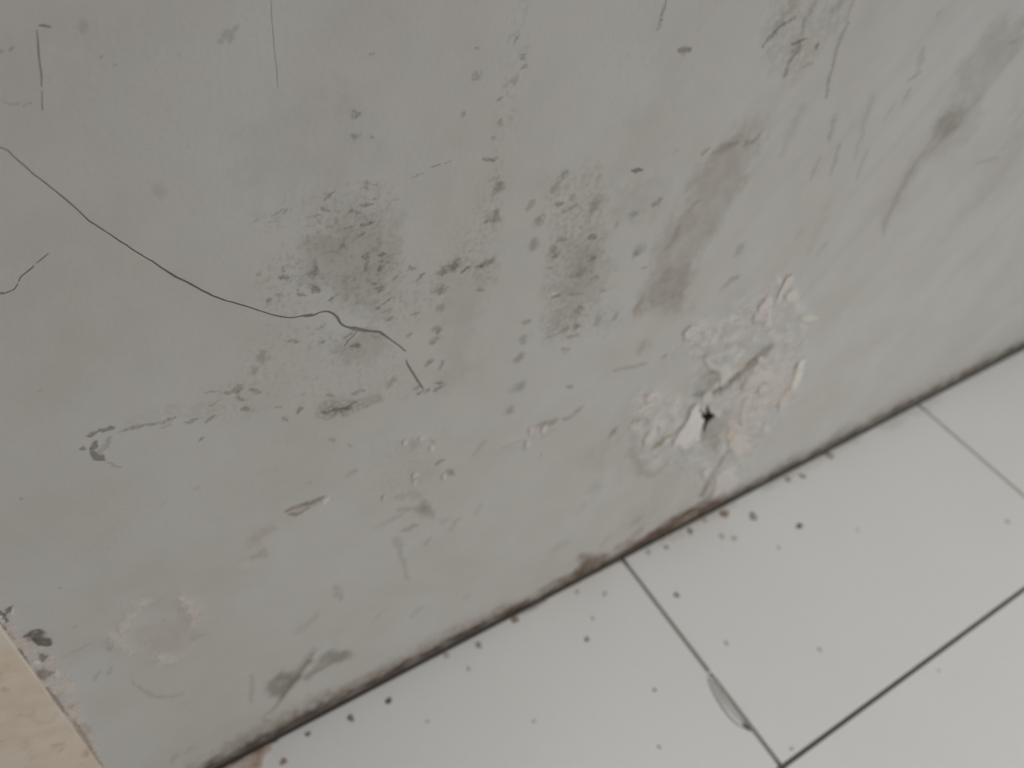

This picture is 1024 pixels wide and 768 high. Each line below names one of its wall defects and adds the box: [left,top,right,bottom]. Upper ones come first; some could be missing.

crack [0,147,424,389]
peeling [614,263,820,507]